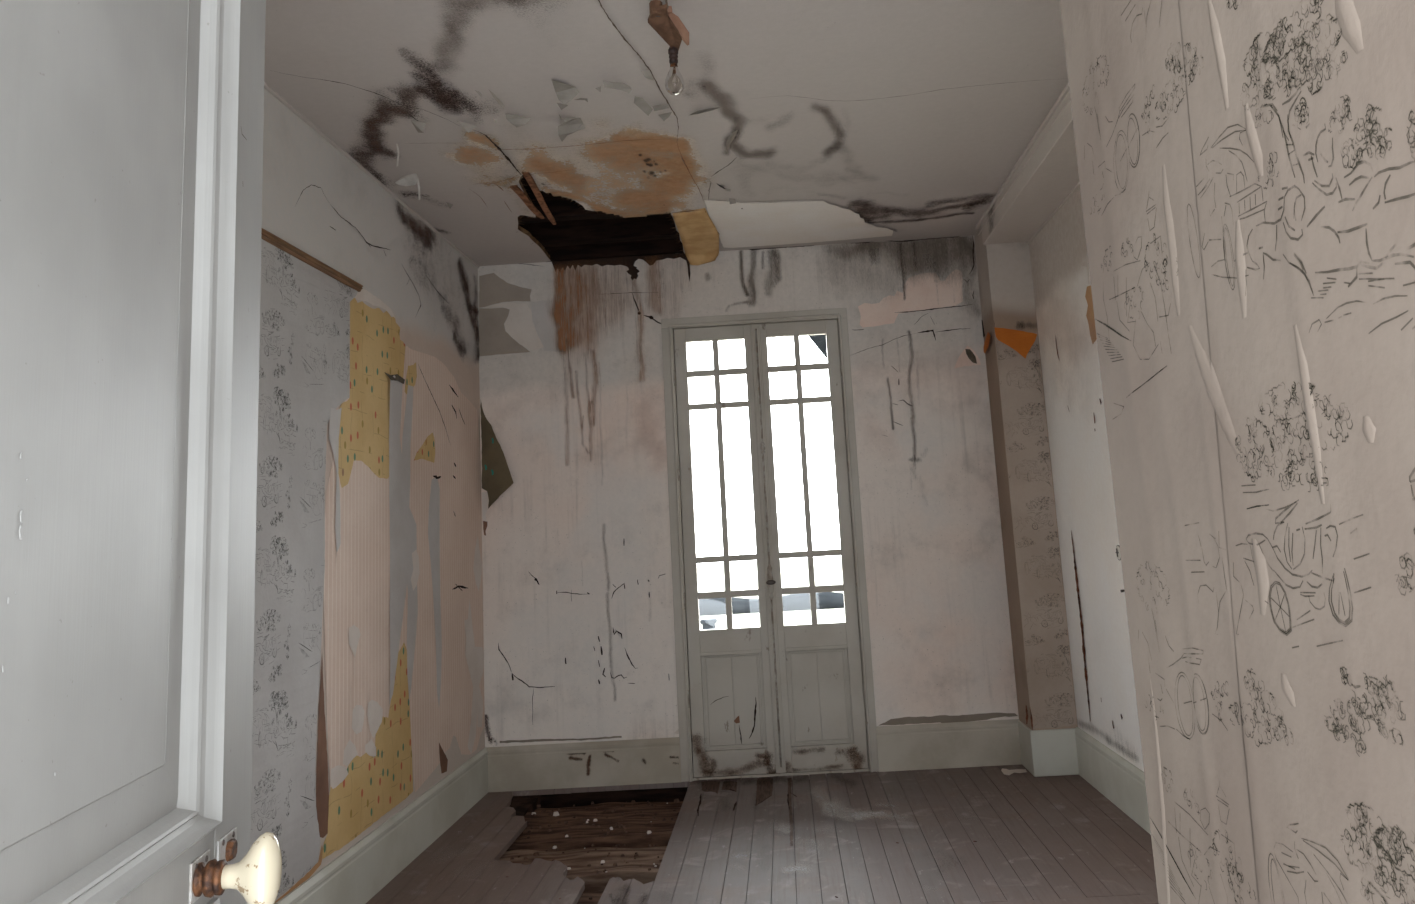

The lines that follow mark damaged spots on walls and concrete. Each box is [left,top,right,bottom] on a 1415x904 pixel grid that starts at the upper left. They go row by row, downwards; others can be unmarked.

damp [349,53,481,185]
damp [397,193,447,283]
damp [446,259,480,360]
damp [552,266,620,383]
damp [523,129,705,218]
spalling [552,253,690,281]
crack [270,0,974,437]
damp [739,251,778,304]
flaking render [858,269,963,327]
crack [498,629,669,721]
flaking render [316,659,329,838]
flaking render [439,743,448,774]